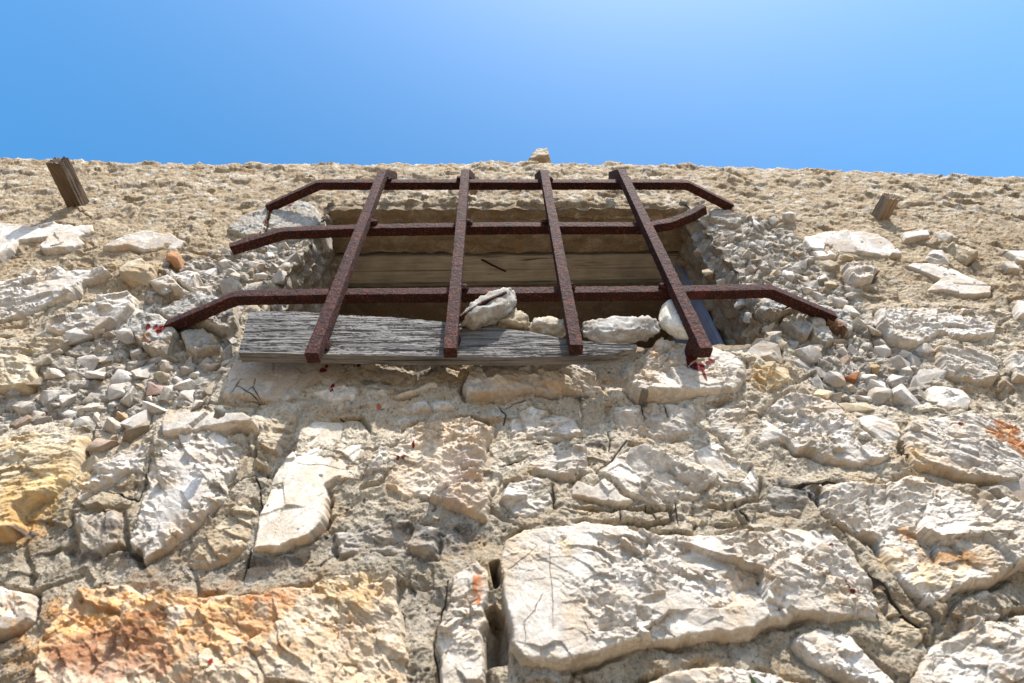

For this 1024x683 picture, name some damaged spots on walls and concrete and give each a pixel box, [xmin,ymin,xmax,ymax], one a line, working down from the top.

rust [826,320,847,339]
crack [433,584,448,683]